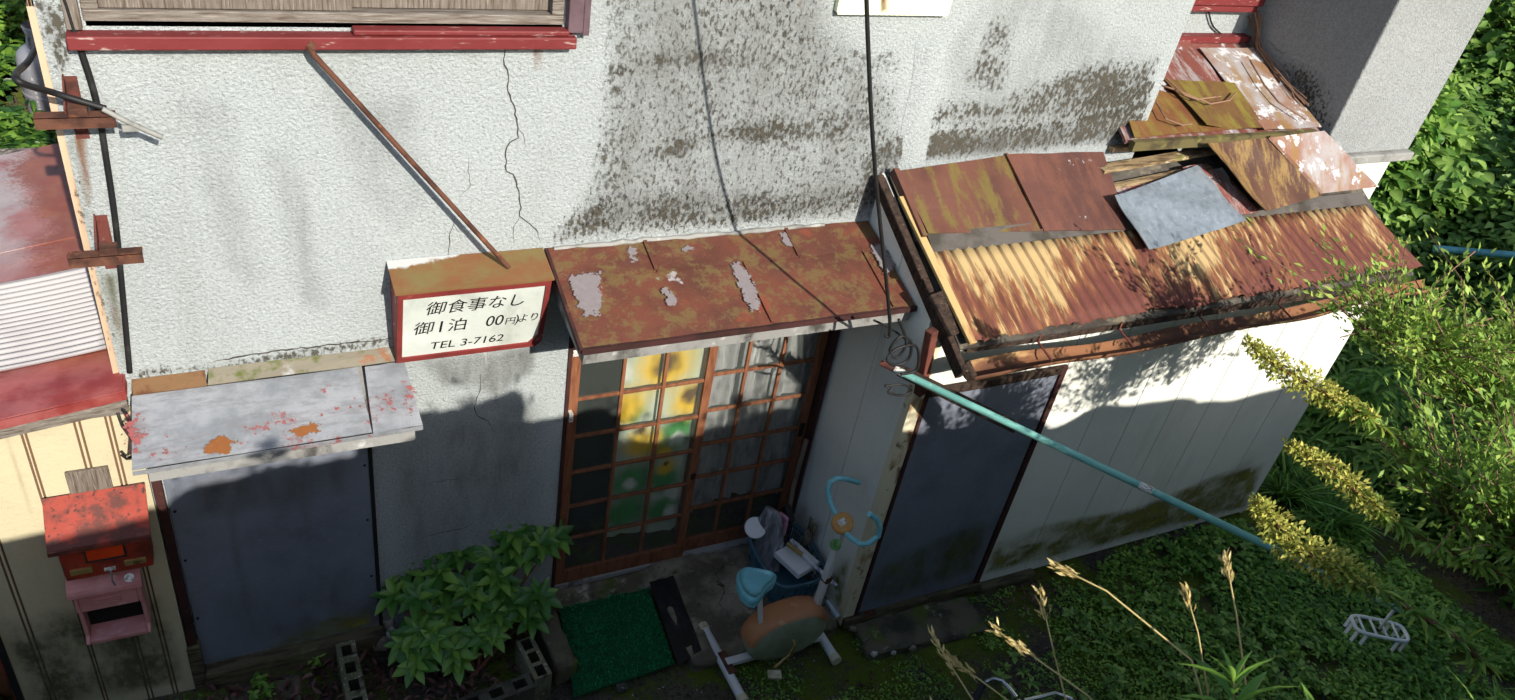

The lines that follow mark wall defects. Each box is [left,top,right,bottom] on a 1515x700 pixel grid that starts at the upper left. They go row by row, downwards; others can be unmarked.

water stain [926,17,1158,157]
water stain [554,0,903,241]
crack [448,50,540,254]
peeling [871,244,897,274]
peeling [565,271,604,317]
peeling [661,287,679,306]
peeling [731,261,760,312]
corrosion [204,435,238,455]
corrosion [289,422,322,438]
mould [19,619,158,700]